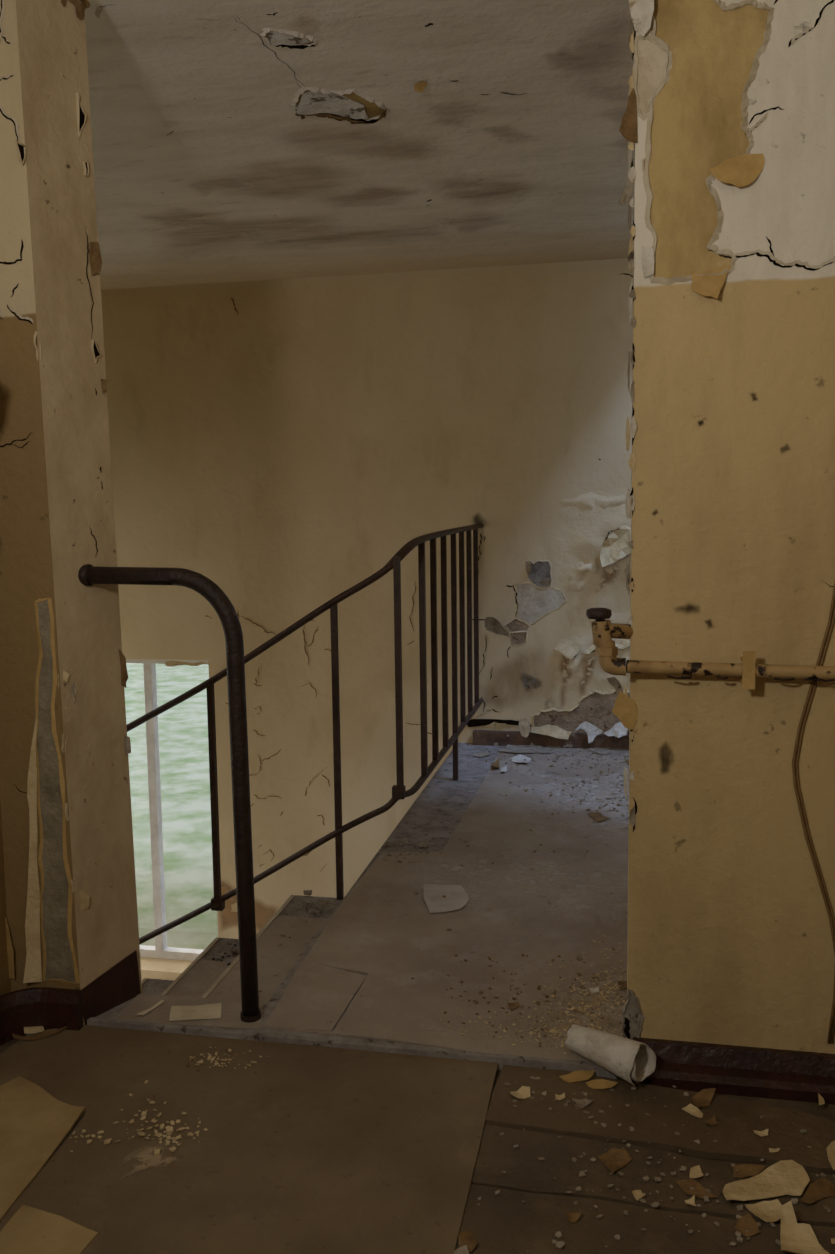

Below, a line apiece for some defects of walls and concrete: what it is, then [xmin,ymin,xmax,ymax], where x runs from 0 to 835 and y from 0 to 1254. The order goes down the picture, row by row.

crack [0,0,22,144]
peeling [261,28,318,49]
peeling [291,87,391,124]
crack [745,106,784,135]
crack [788,0,834,47]
peeling [618,0,775,328]
crack [0,239,34,324]
crack [708,237,835,271]
peeling [600,344,637,594]
peeling [484,559,568,647]
crack [226,667,330,871]
peeling [467,718,564,763]